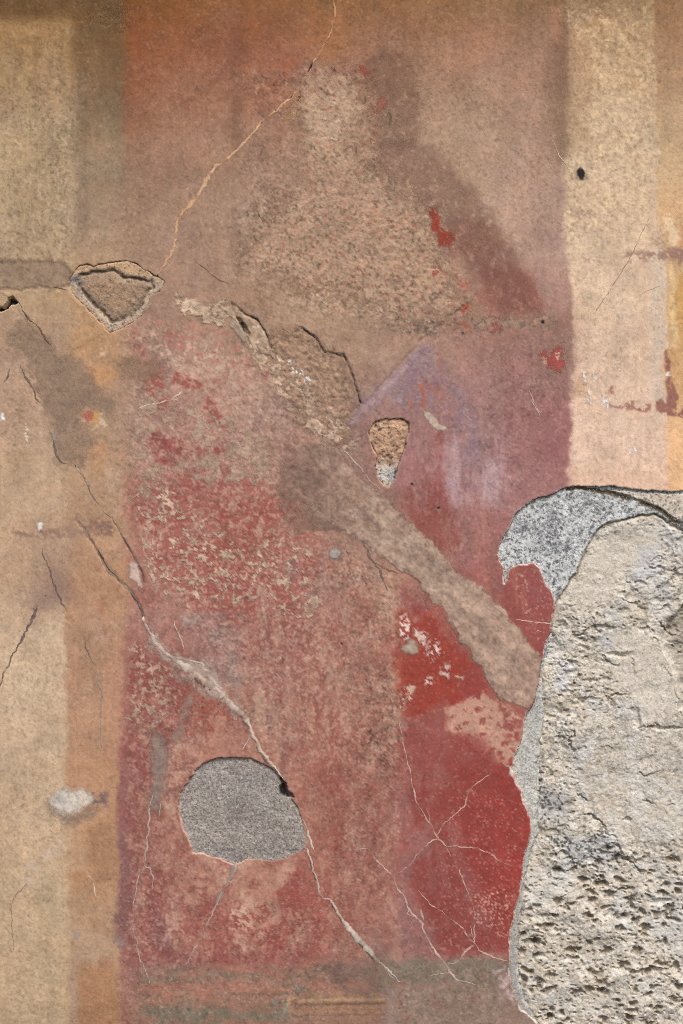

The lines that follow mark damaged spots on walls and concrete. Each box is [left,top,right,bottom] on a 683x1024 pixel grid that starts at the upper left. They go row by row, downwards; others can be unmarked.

crack [157,0,347,360]
flaking render [70,261,164,333]
flaking render [174,293,238,327]
flaking render [244,328,409,486]
crack [0,550,67,686]
crack [49,430,283,778]
crack [346,541,402,590]
crack [132,791,162,984]
flaking render [179,757,306,864]
crack [302,819,402,984]
crack [356,723,511,985]
flaking render [498,486,683,1024]